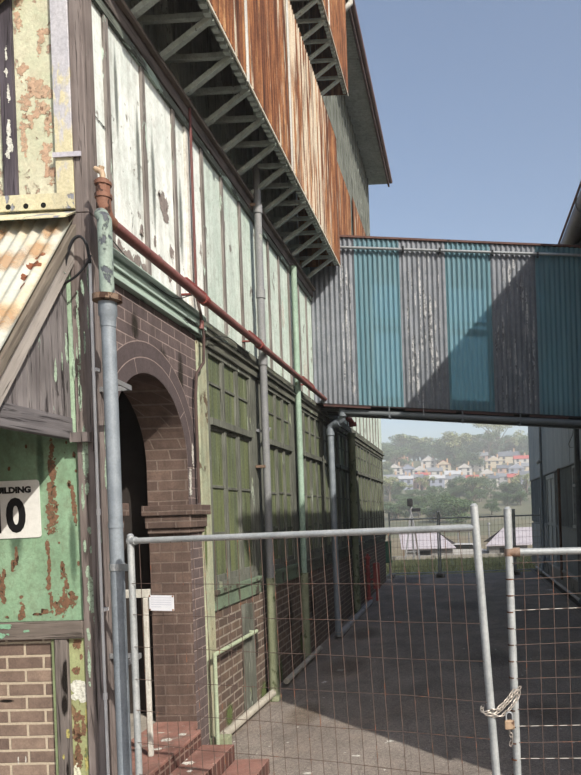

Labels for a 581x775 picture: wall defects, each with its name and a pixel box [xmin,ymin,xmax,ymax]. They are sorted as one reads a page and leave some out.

peeling [13,0,23,32]
peeling [36,28,51,57]
peeling [4,48,56,186]
peeling [158,191,169,224]
rust [337,162,366,236]
rust [0,227,57,289]
peeling [0,438,95,775]